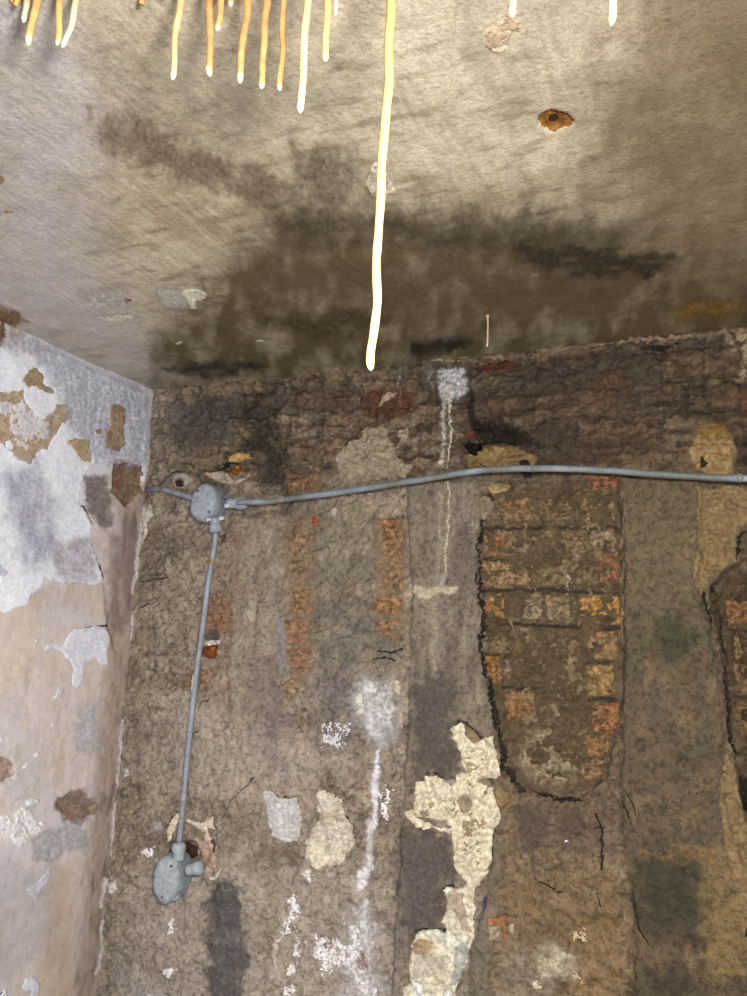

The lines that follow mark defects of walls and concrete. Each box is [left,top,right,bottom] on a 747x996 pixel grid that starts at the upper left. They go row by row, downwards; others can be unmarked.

water stain [99,117,293,197]
water stain [296,152,398,200]
water stain [411,339,468,466]
spalling [430,327,747,374]
water stain [724,332,747,382]
peeling [0,330,149,613]
peeling [33,624,110,715]
water stain [271,482,460,996]
spalling [402,384,627,996]
spalling [698,571,747,813]
spalling [55,790,97,824]
water stain [202,882,250,996]